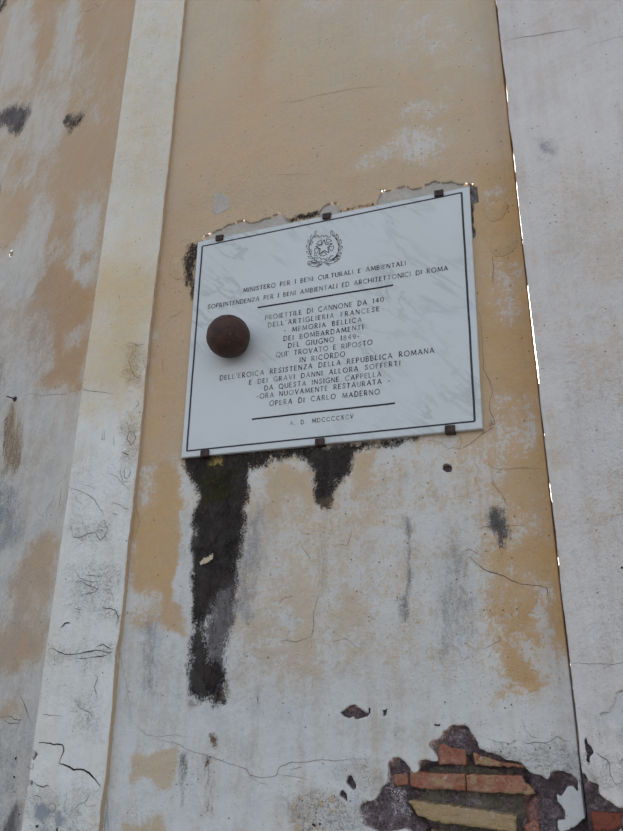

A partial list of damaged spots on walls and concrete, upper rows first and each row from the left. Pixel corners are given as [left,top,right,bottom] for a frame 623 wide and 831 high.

damp [0,102,31,135]
flaking render [470,184,479,238]
crack [62,574,118,627]
damp [182,436,419,708]
crack [463,549,548,593]
crack [52,644,130,711]
crack [26,742,108,831]
flaking render [360,724,623,831]